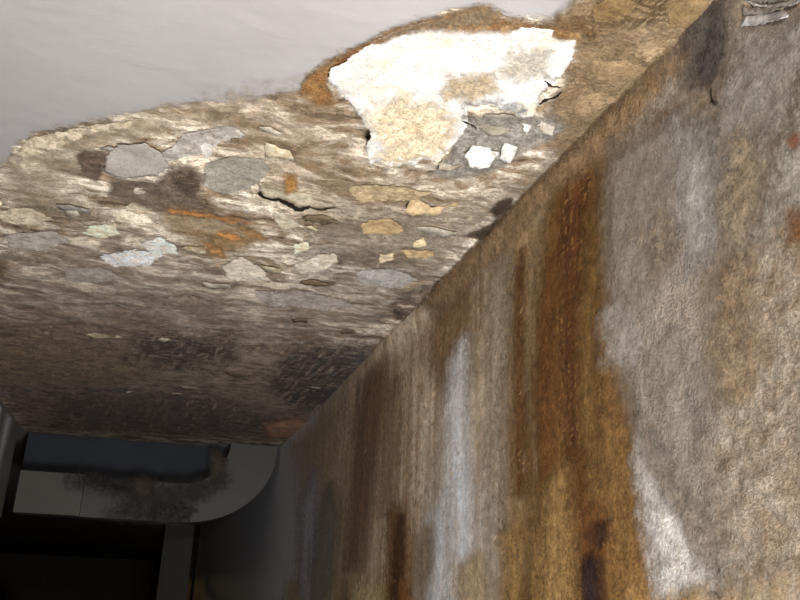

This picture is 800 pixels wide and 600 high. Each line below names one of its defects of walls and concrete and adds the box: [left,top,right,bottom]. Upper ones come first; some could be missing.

peeling [740,0,800,27]
peeling [0,383,289,446]
damp [0,308,417,600]
peeling [0,0,583,366]
corrosion [384,505,412,600]
corrosion [428,157,662,600]
damp [414,0,800,600]
crack [706,557,732,600]